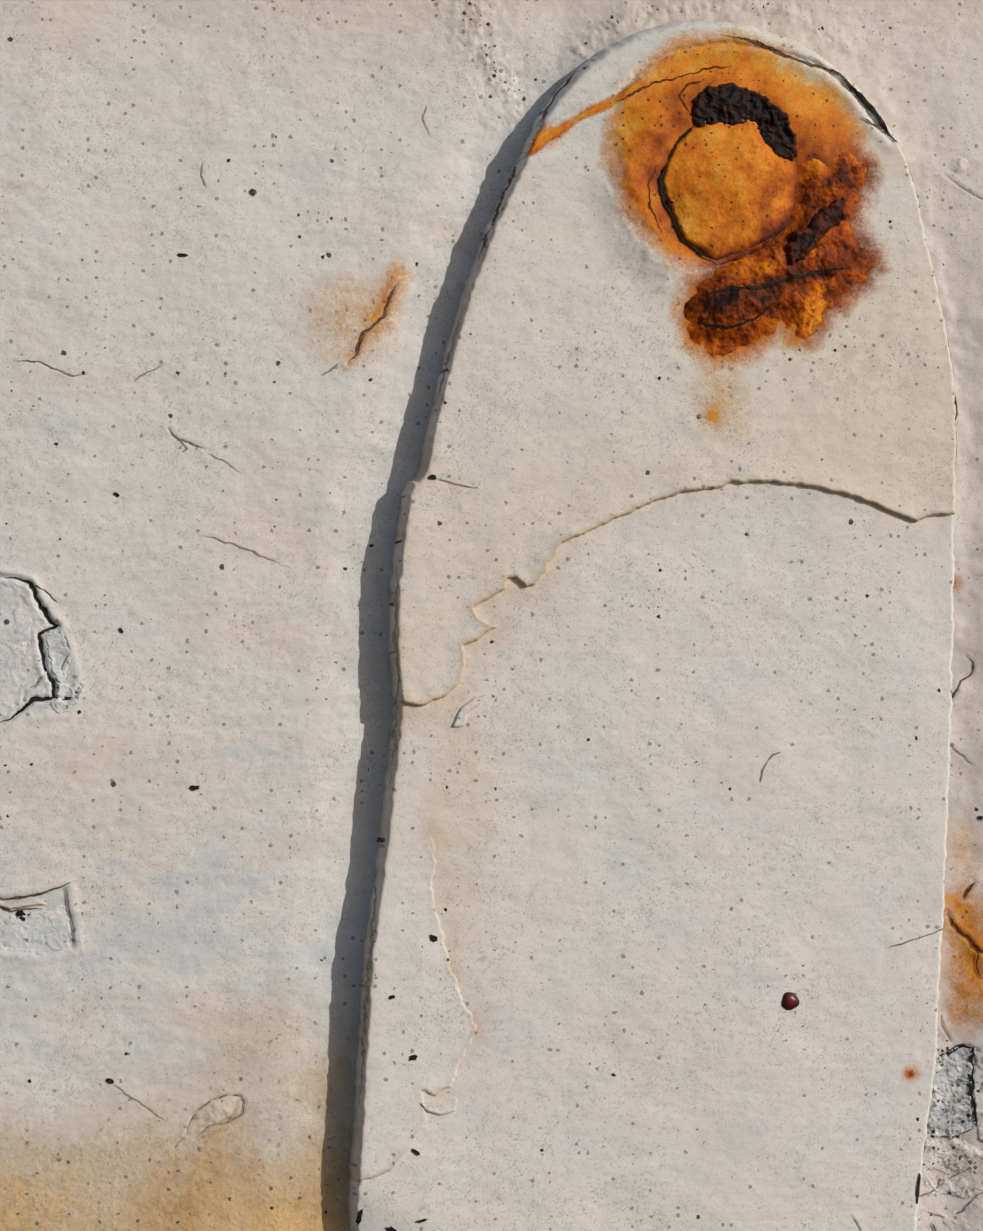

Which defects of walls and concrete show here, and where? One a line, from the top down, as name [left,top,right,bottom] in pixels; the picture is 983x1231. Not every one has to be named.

rust [526,31,886,425]
rust [331,267,405,343]
peeling [387,20,957,707]
spalling [0,577,83,722]
peeling [452,694,490,728]
peeling [0,881,75,956]
peeling [349,834,477,1182]
rust [944,894,983,1021]
leakage [0,1116,352,1231]
spalling [916,1044,983,1231]